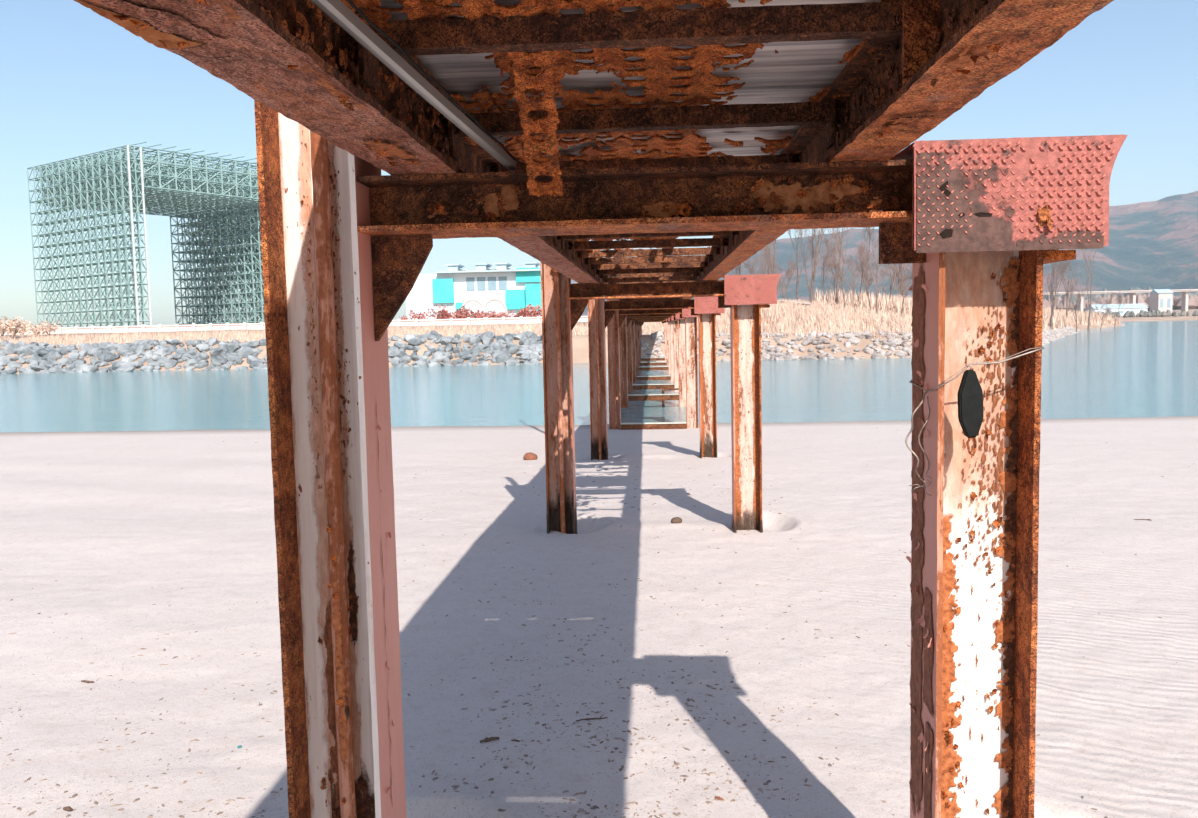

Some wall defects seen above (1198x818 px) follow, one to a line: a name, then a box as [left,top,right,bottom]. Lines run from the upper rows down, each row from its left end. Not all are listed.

rust [258,0,452,166]
rust [926,44,1001,86]
rust [467,184,520,222]
rust [642,201,692,218]
rust [713,173,883,215]
rust [292,124,375,818]
rust [906,152,1104,818]